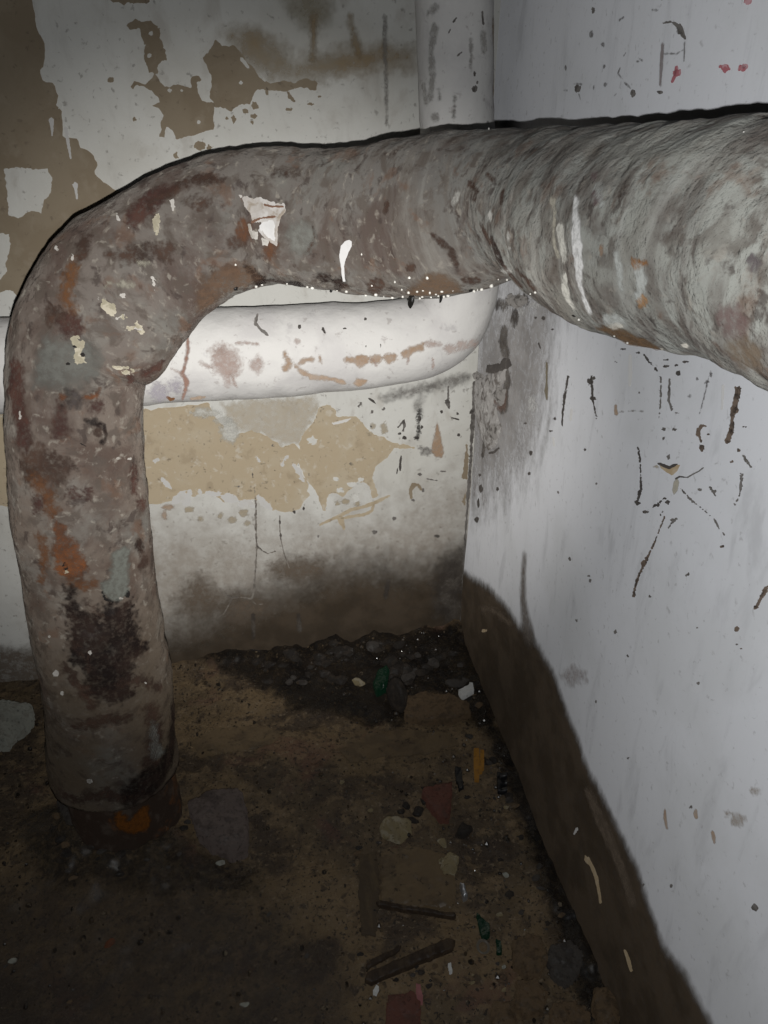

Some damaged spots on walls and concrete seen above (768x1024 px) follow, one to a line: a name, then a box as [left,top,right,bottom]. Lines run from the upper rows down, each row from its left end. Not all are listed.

peeling [126,19,321,151]
peeling [0,0,120,317]
peeling [152,213,160,235]
peeling [98,280,145,335]
peeling [0,414,8,507]
peeling [116,402,415,525]
peeling [409,473,424,502]
damp [166,516,710,1024]